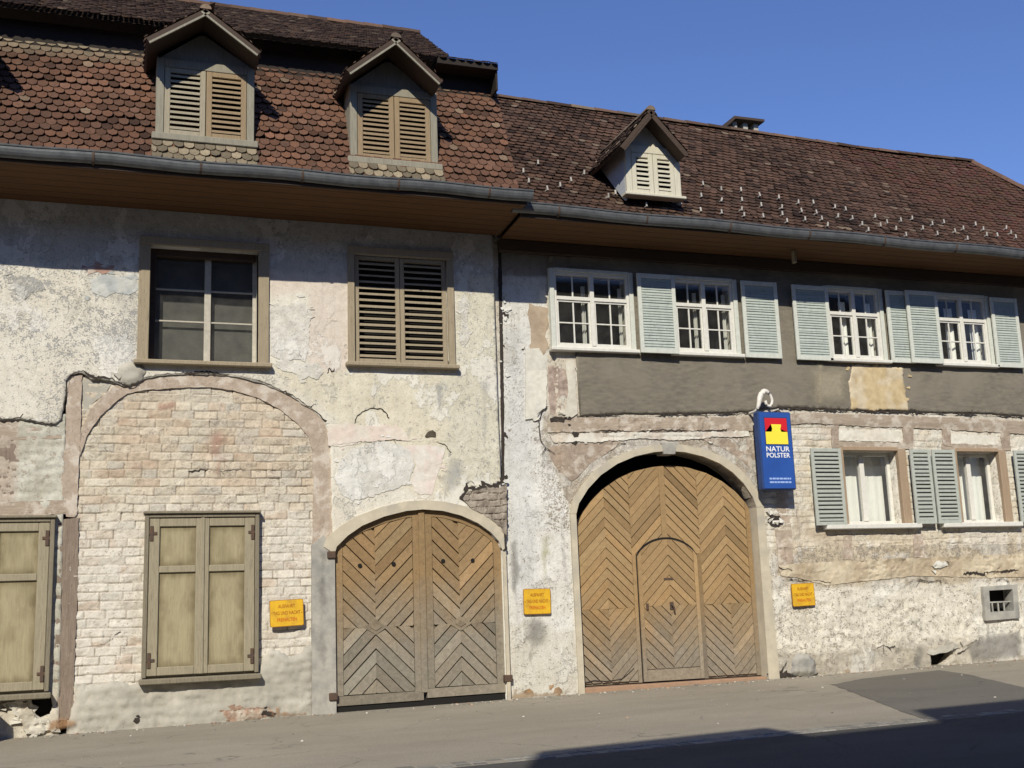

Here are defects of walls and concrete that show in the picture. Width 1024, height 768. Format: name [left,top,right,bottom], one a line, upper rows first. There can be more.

crack [0,370,451,452]
crack [538,406,555,454]
flaking render [522,346,750,445]
flaking render [327,422,447,505]
spalling [463,484,507,536]
spalling [930,653,945,665]
spalling [1,700,61,737]